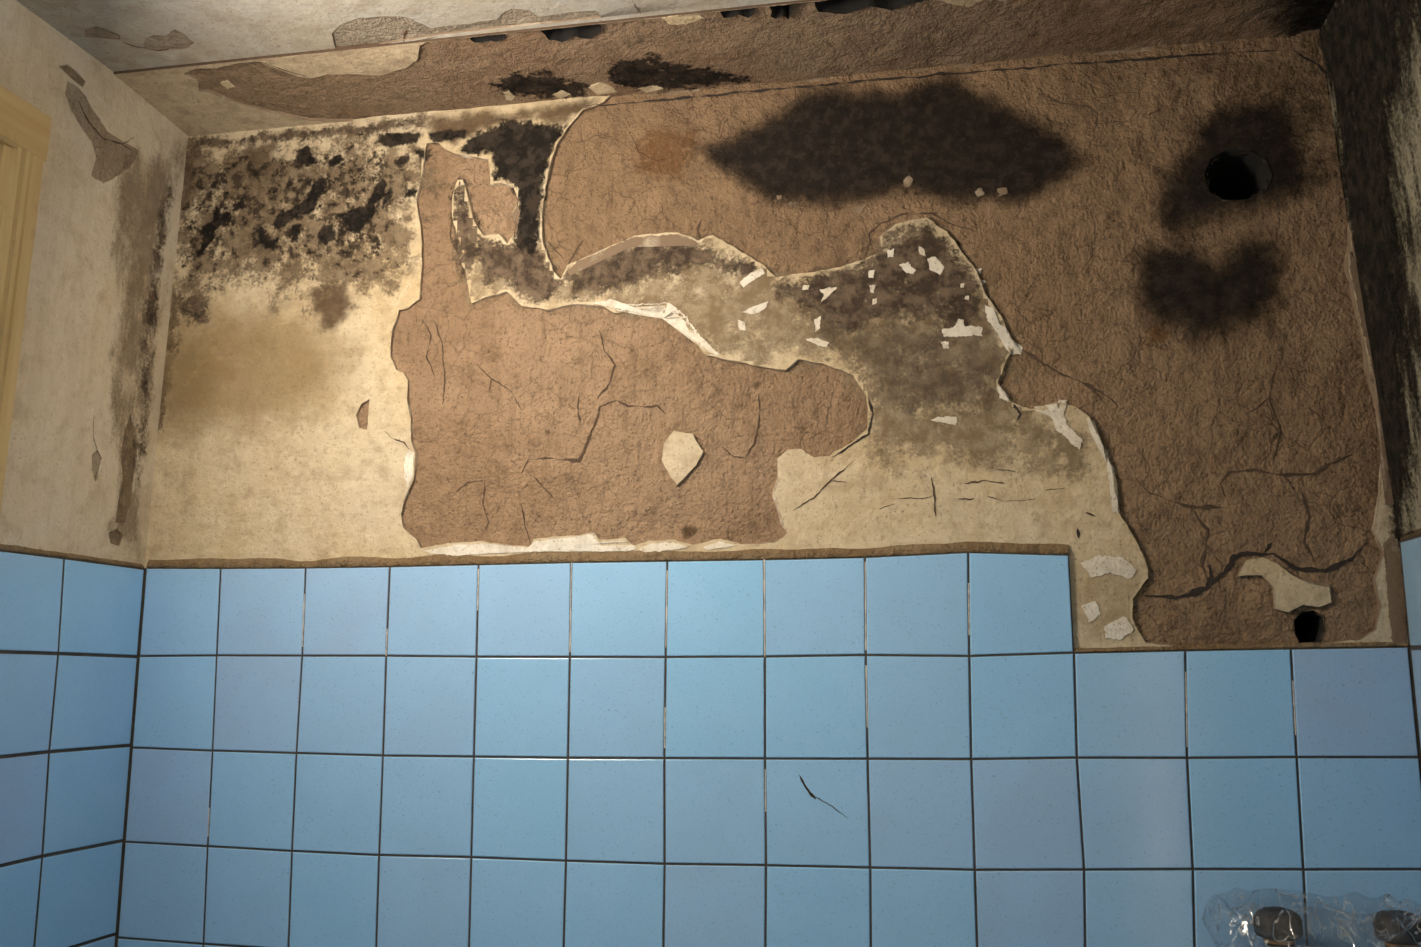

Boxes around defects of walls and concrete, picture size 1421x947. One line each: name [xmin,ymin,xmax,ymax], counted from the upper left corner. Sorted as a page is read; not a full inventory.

peeling [59,64,138,184]
leakage [608,52,751,92]
crack [422,311,521,409]
crack [455,331,665,541]
leakage [111,69,1086,541]
crack [723,395,760,458]
flaking render [185,0,1406,646]
crack [1134,361,1374,600]
leakage [1266,0,1421,554]